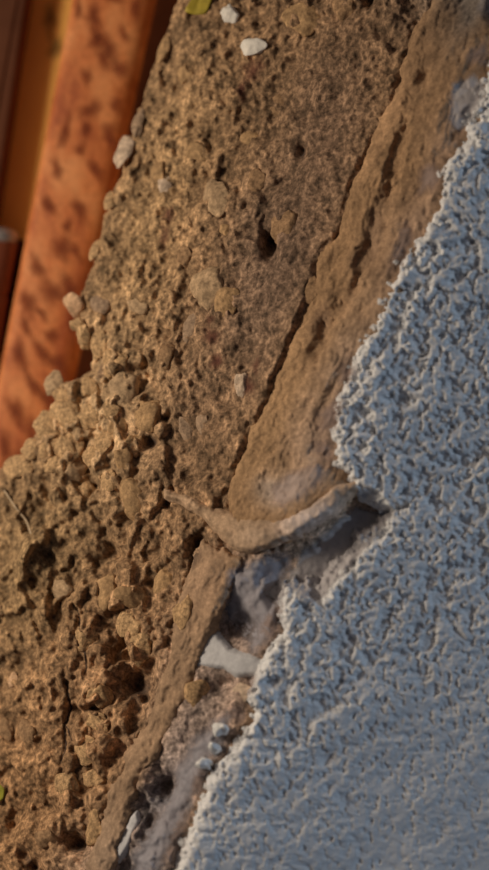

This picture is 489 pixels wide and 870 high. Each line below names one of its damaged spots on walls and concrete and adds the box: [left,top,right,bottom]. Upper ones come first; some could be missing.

spalling [113,135,135,168]
flaking render [228,0,489,523]
spalling [189,266,224,312]
spalling [90,330,108,362]
spalling [78,403,99,430]
spalling [135,400,161,433]
spalling [94,429,114,454]
spalling [100,474,117,491]
spalling [119,477,142,521]
flaking render [164,482,359,555]
flaking render [263,509,393,606]
flaking render [82,538,284,870]